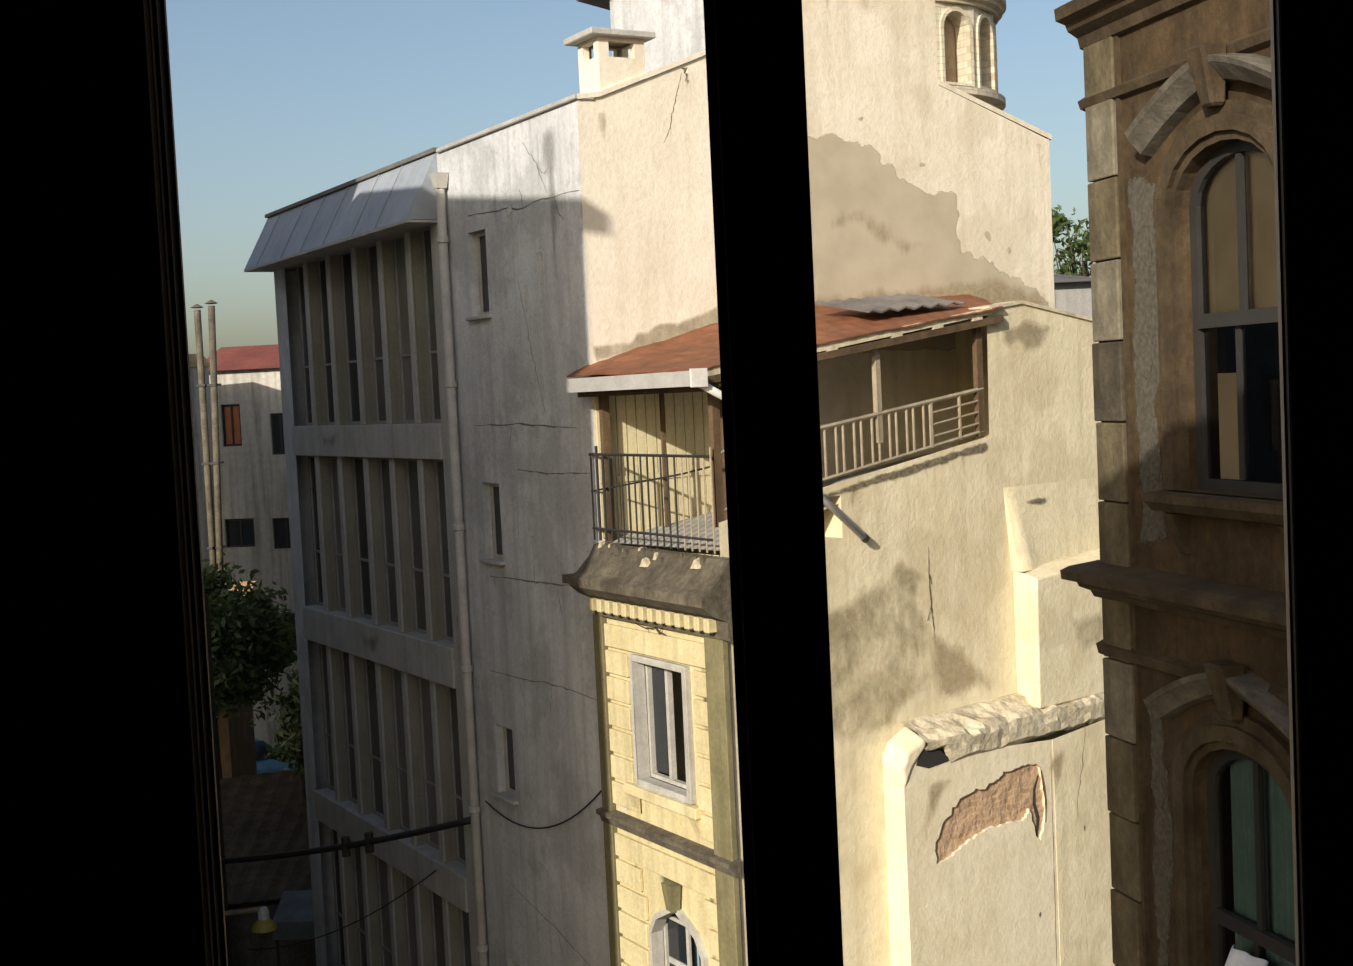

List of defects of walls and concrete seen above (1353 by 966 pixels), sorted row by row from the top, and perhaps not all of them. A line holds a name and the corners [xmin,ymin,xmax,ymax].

crack [468,143,579,218]
peeling [808,133,1048,307]
peeling [864,332,955,352]
water stain [829,601,874,645]
water stain [936,642,976,693]
spalling [935,764,1047,863]